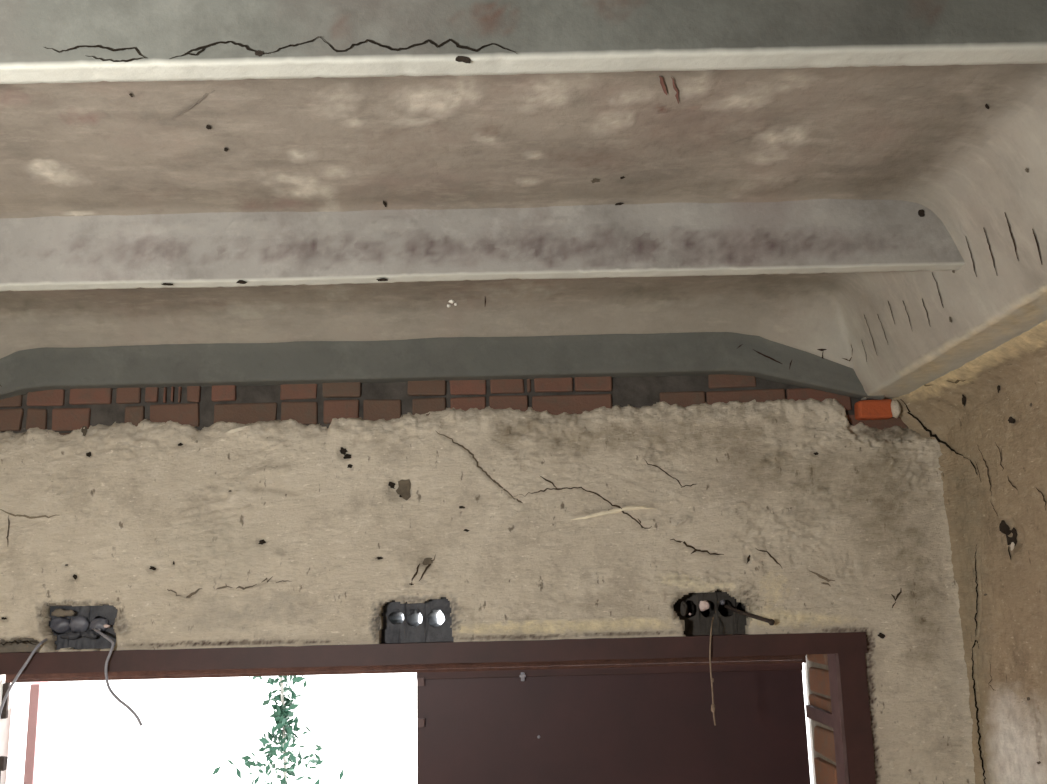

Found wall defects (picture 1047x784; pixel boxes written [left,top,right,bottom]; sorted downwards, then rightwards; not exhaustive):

crack [44,37,517,62]
crack [435,430,724,555]
crack [971,545,996,784]